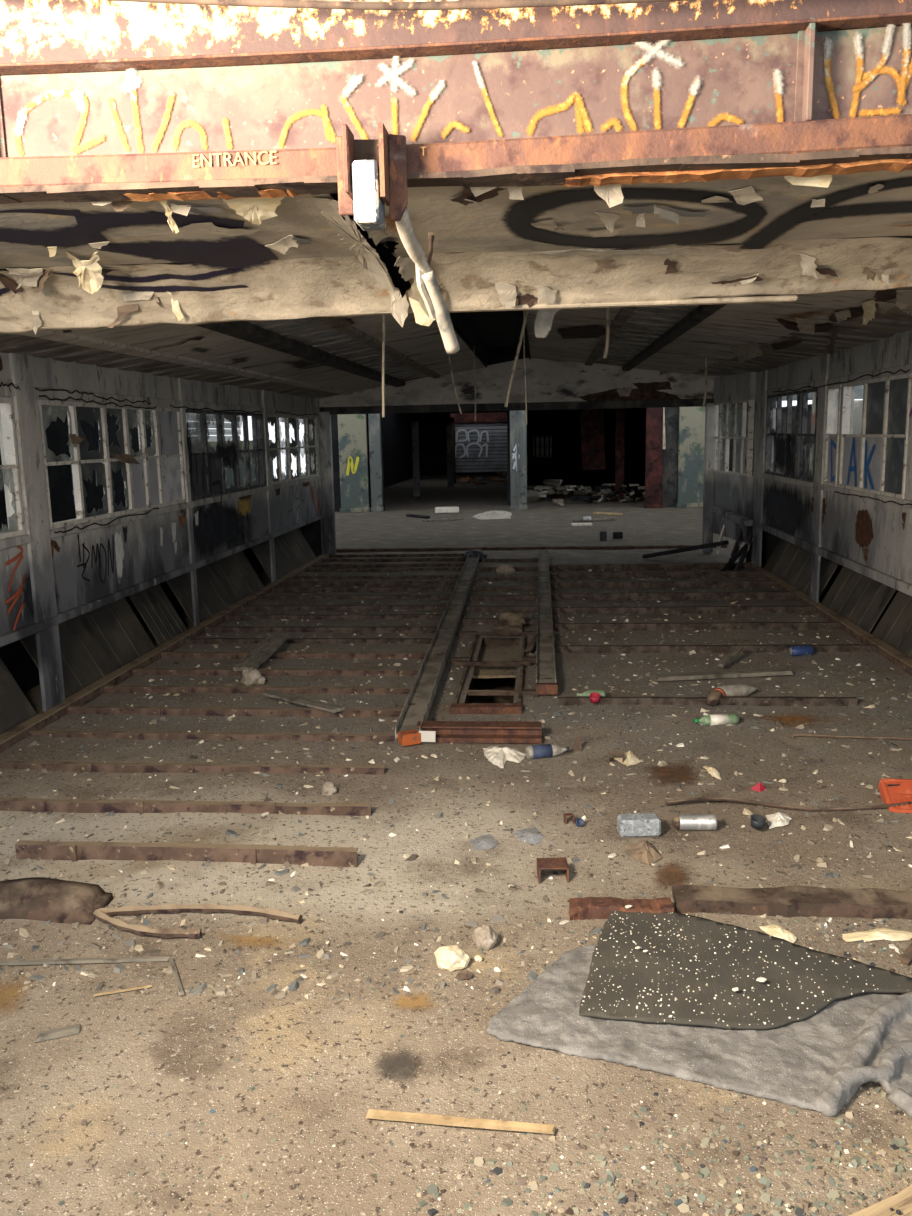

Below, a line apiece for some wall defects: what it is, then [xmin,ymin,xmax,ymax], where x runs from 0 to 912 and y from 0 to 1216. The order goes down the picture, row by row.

corrosion [354,139,379,165]
peeling [159,197,285,236]
peeling [450,186,524,206]
peeling [587,184,763,237]
corrosion [549,159,912,187]
peeling [784,175,832,208]
peeling [265,235,313,254]
crack [313,193,426,298]
peeling [0,241,118,294]
peeling [108,291,184,328]
peeling [387,274,436,328]
peeling [495,282,557,308]